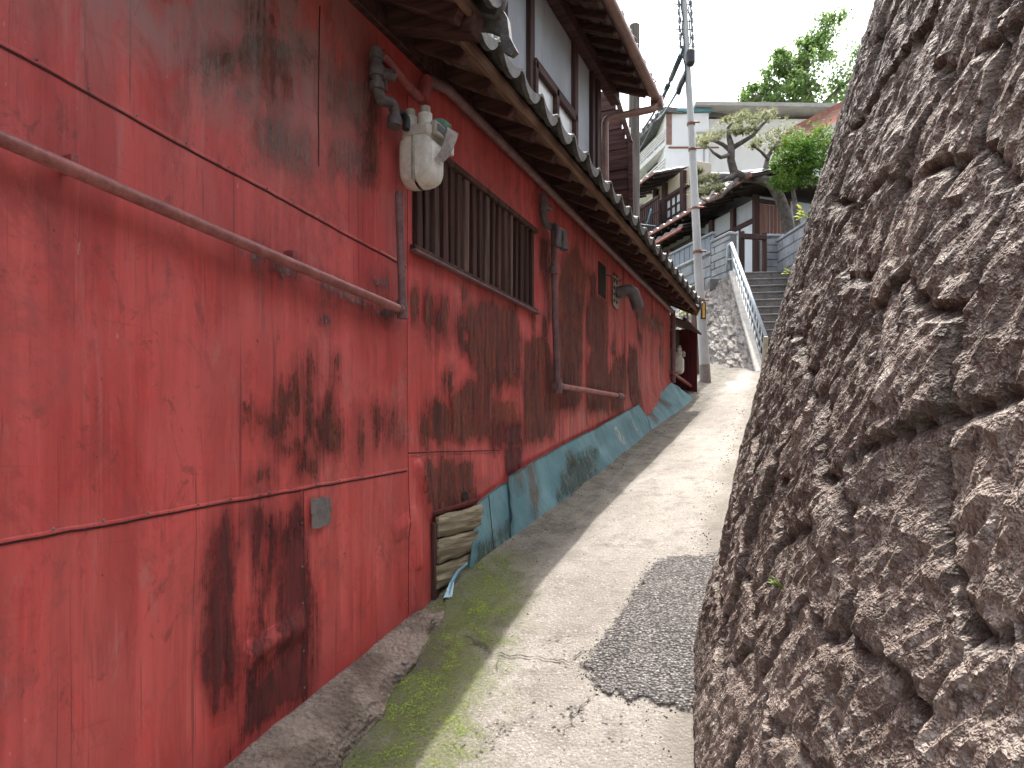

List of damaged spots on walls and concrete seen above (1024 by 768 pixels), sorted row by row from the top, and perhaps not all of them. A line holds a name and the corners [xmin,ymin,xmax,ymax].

rust [201,500,318,759]